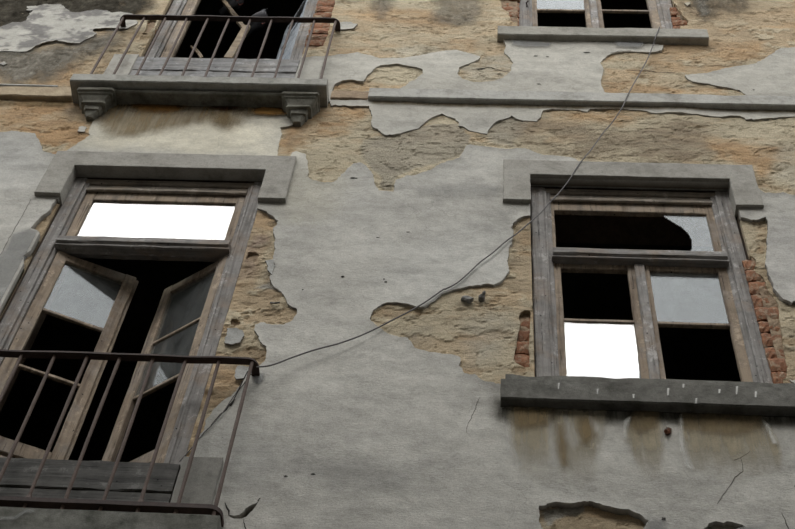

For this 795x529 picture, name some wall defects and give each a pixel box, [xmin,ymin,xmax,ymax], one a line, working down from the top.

flaking render [0,0,172,87]
flaking render [302,0,520,92]
flaking render [601,0,795,96]
flaking render [0,99,92,154]
flaking render [277,103,795,195]
flaking render [186,210,297,457]
flaking render [370,218,535,384]
flaking render [739,220,795,384]
flaking render [539,506,645,529]